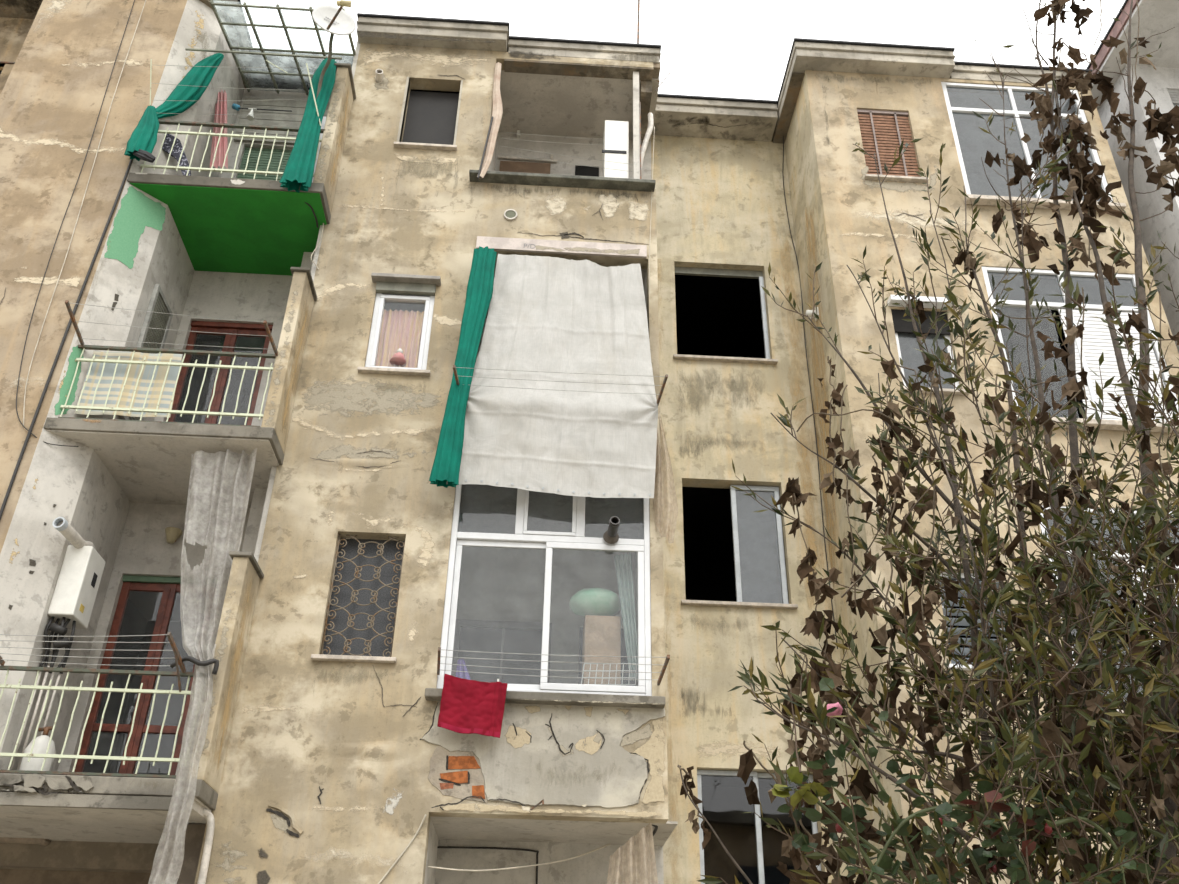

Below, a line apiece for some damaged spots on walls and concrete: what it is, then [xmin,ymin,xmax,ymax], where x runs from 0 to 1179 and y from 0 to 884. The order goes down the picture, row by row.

peeling [104,172,166,269]
crack [512,714,574,757]
peeling [420,699,666,817]
spalling [0,773,94,795]
spalling [266,805,303,838]